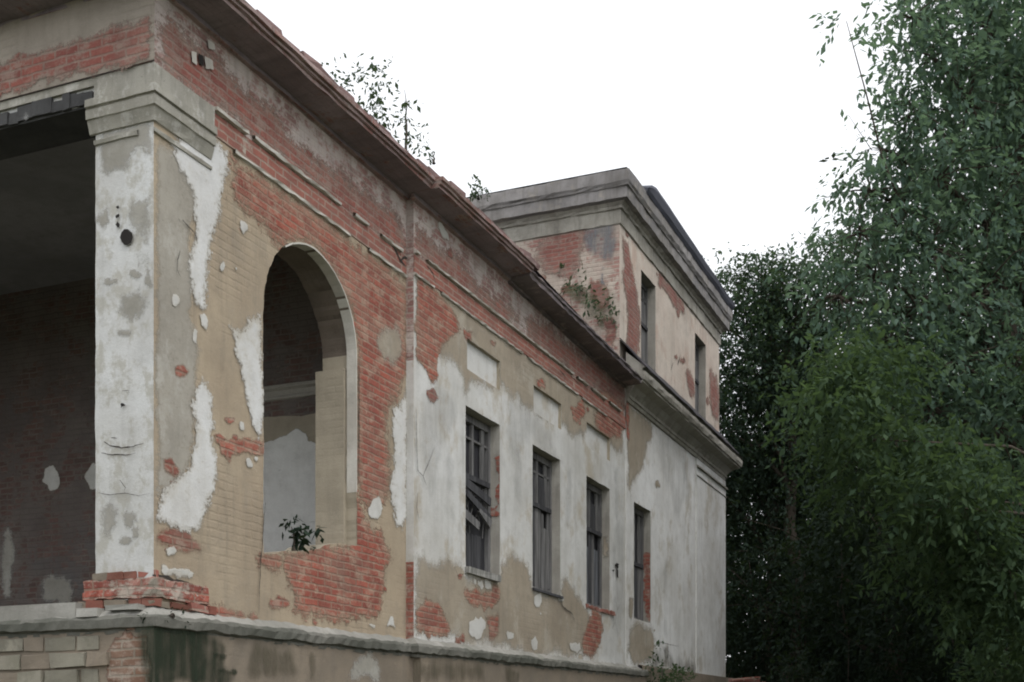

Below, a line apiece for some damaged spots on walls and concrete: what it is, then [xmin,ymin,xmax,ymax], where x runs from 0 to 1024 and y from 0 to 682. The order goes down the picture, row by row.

flaking render [0,10,406,256]
flaking render [656,272,685,318]
flaking render [156,138,652,628]
flaking render [675,355,720,421]
peeling [414,554,604,659]
peeling [628,552,655,665]